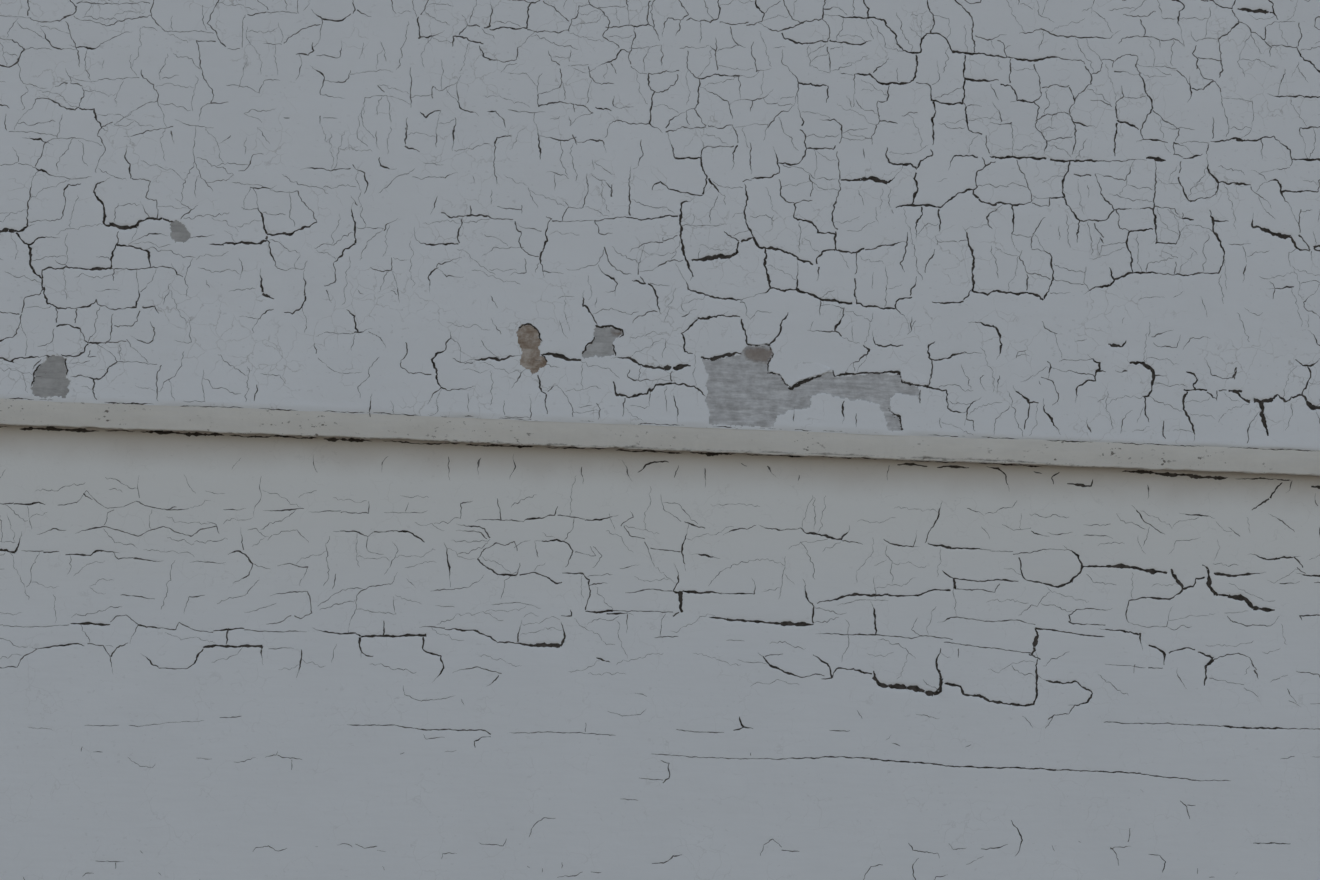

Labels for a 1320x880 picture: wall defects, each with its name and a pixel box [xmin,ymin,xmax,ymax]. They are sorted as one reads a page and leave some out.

peeling [170,220,191,243]
peeling [516,323,548,374]
peeling [582,325,624,359]
peeling [30,355,71,398]
peeling [702,338,929,432]
crack [0,426,1320,752]
crack [81,716,241,768]
crack [626,712,1229,819]
crack [441,817,601,878]
crack [908,820,1054,880]
crack [1110,829,1166,872]